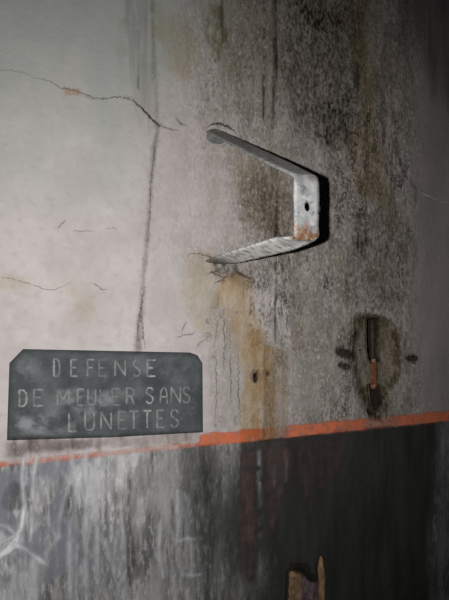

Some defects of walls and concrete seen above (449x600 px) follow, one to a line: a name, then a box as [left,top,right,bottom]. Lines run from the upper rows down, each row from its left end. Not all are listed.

spalling [288,556,326,600]